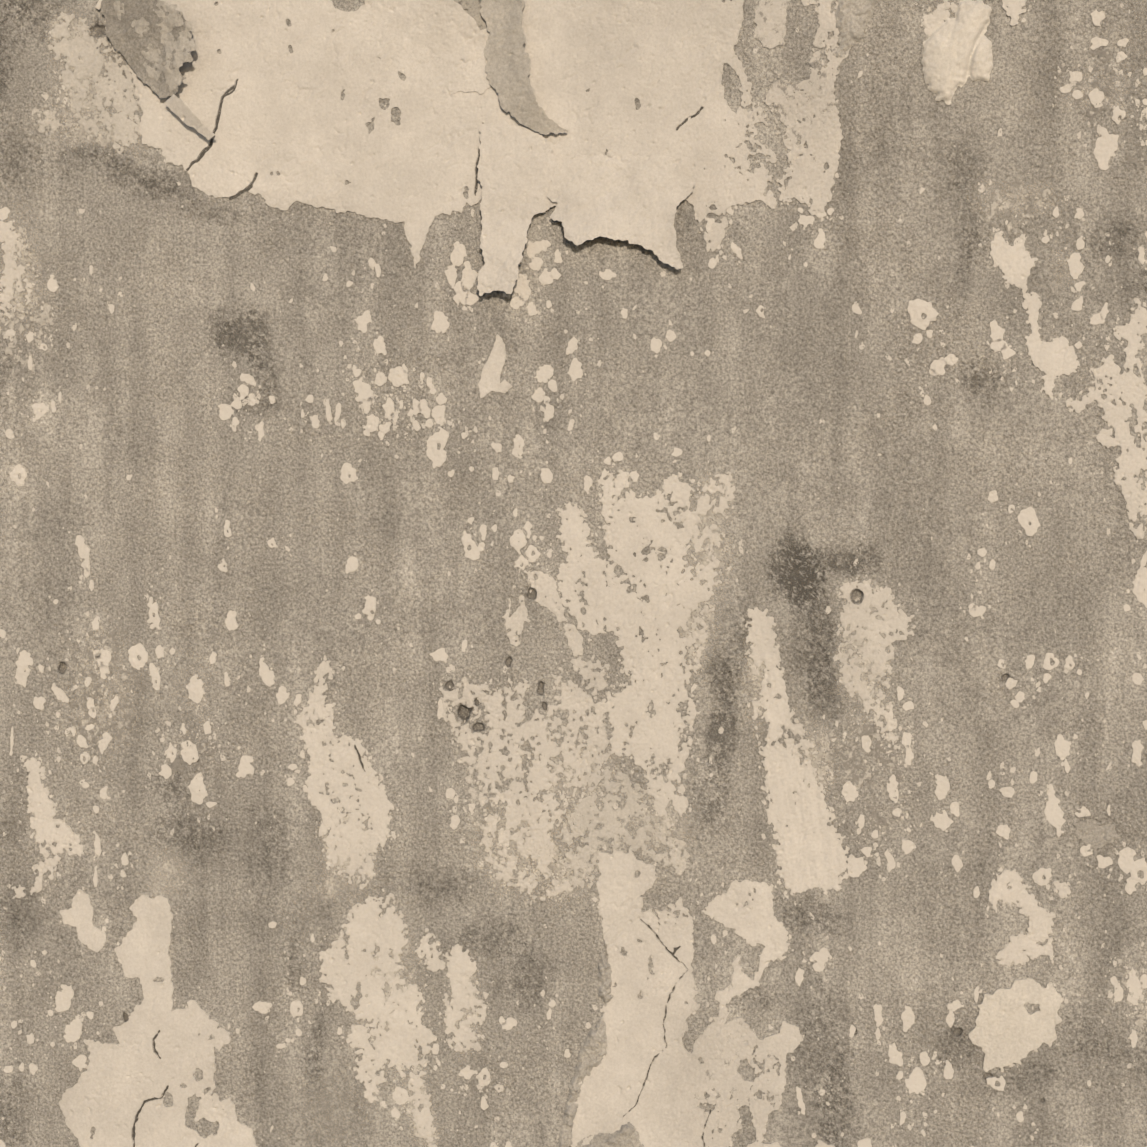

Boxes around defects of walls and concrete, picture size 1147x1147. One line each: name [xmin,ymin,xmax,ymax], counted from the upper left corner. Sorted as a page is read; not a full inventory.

peeling [32,0,877,316]
peeling [0,207,60,377]
peeling [981,175,1147,611]
peeling [1025,653,1082,683]
peeling [4,721,258,1147]
peeling [259,657,517,1147]
crack [636,925,682,1104]
peeling [437,452,916,1147]
peeling [873,1004,930,1094]
peeling [930,775,960,831]
peeling [946,868,1071,1091]
spalling [1029,771,1147,894]